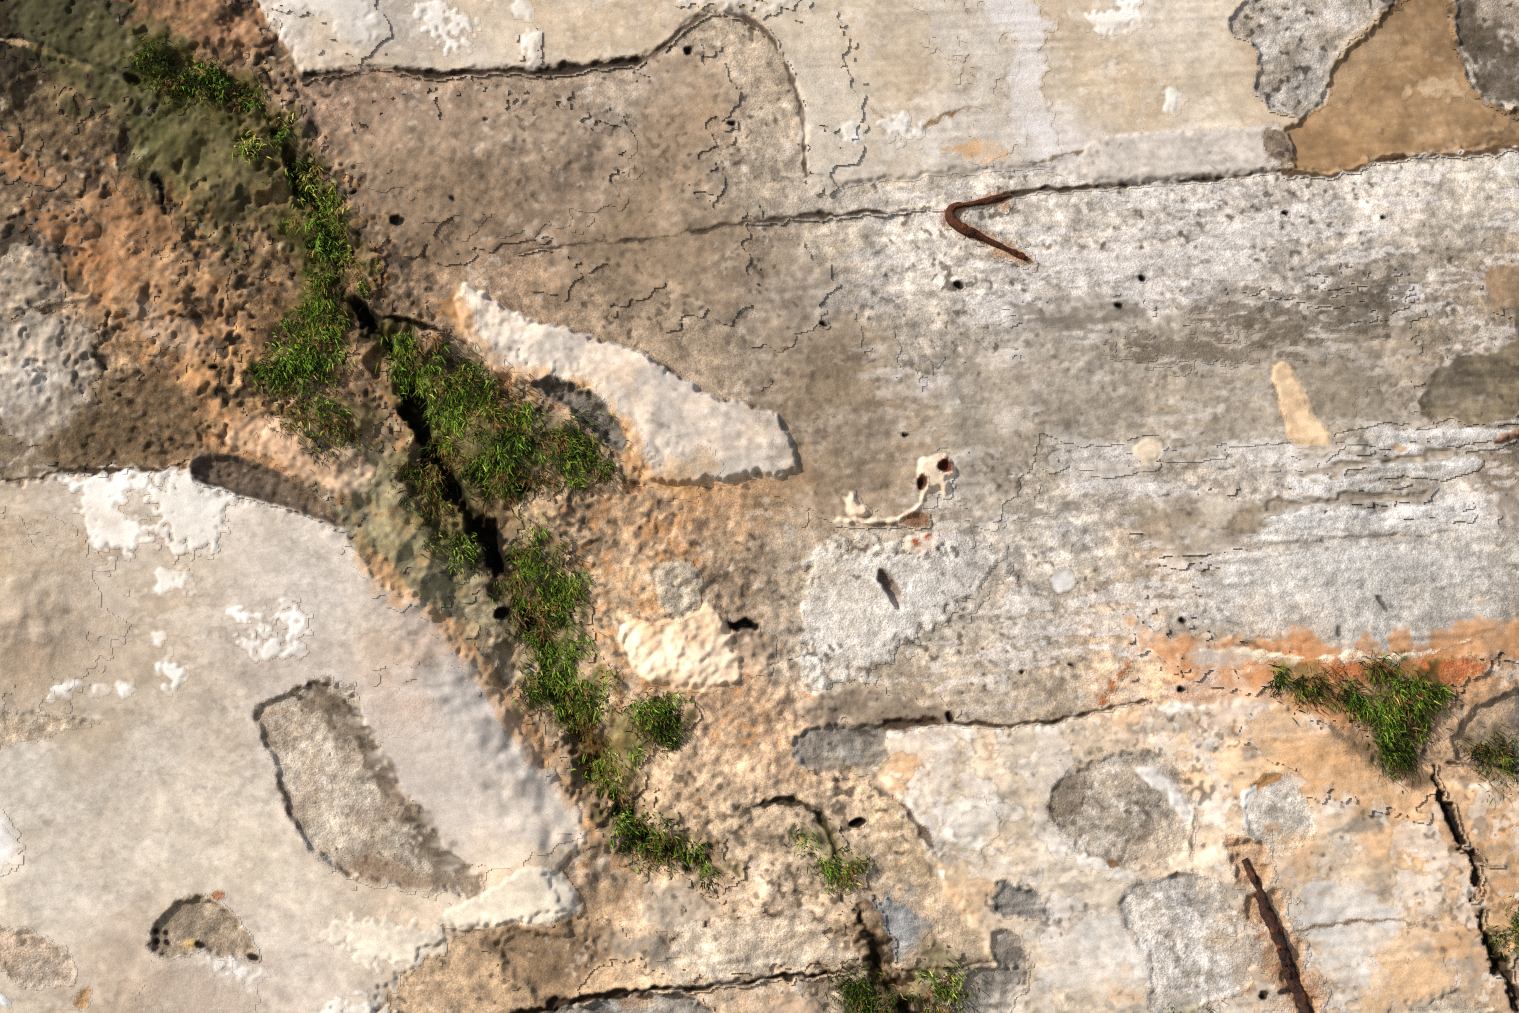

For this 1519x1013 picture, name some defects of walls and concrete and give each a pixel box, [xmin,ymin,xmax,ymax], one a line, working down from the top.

crack [300,7,806,109]
peeling [1226,0,1519,180]
rust [938,185,1038,272]
water stain [0,253,104,446]
water stain [152,333,223,368]
water stain [217,413,376,503]
peeling [343,281,780,509]
spalling [225,596,486,901]
crack [510,901,914,1013]
rust [1221,826,1331,1013]
crack [1293,758,1519,1013]
rust [1355,949,1459,1013]